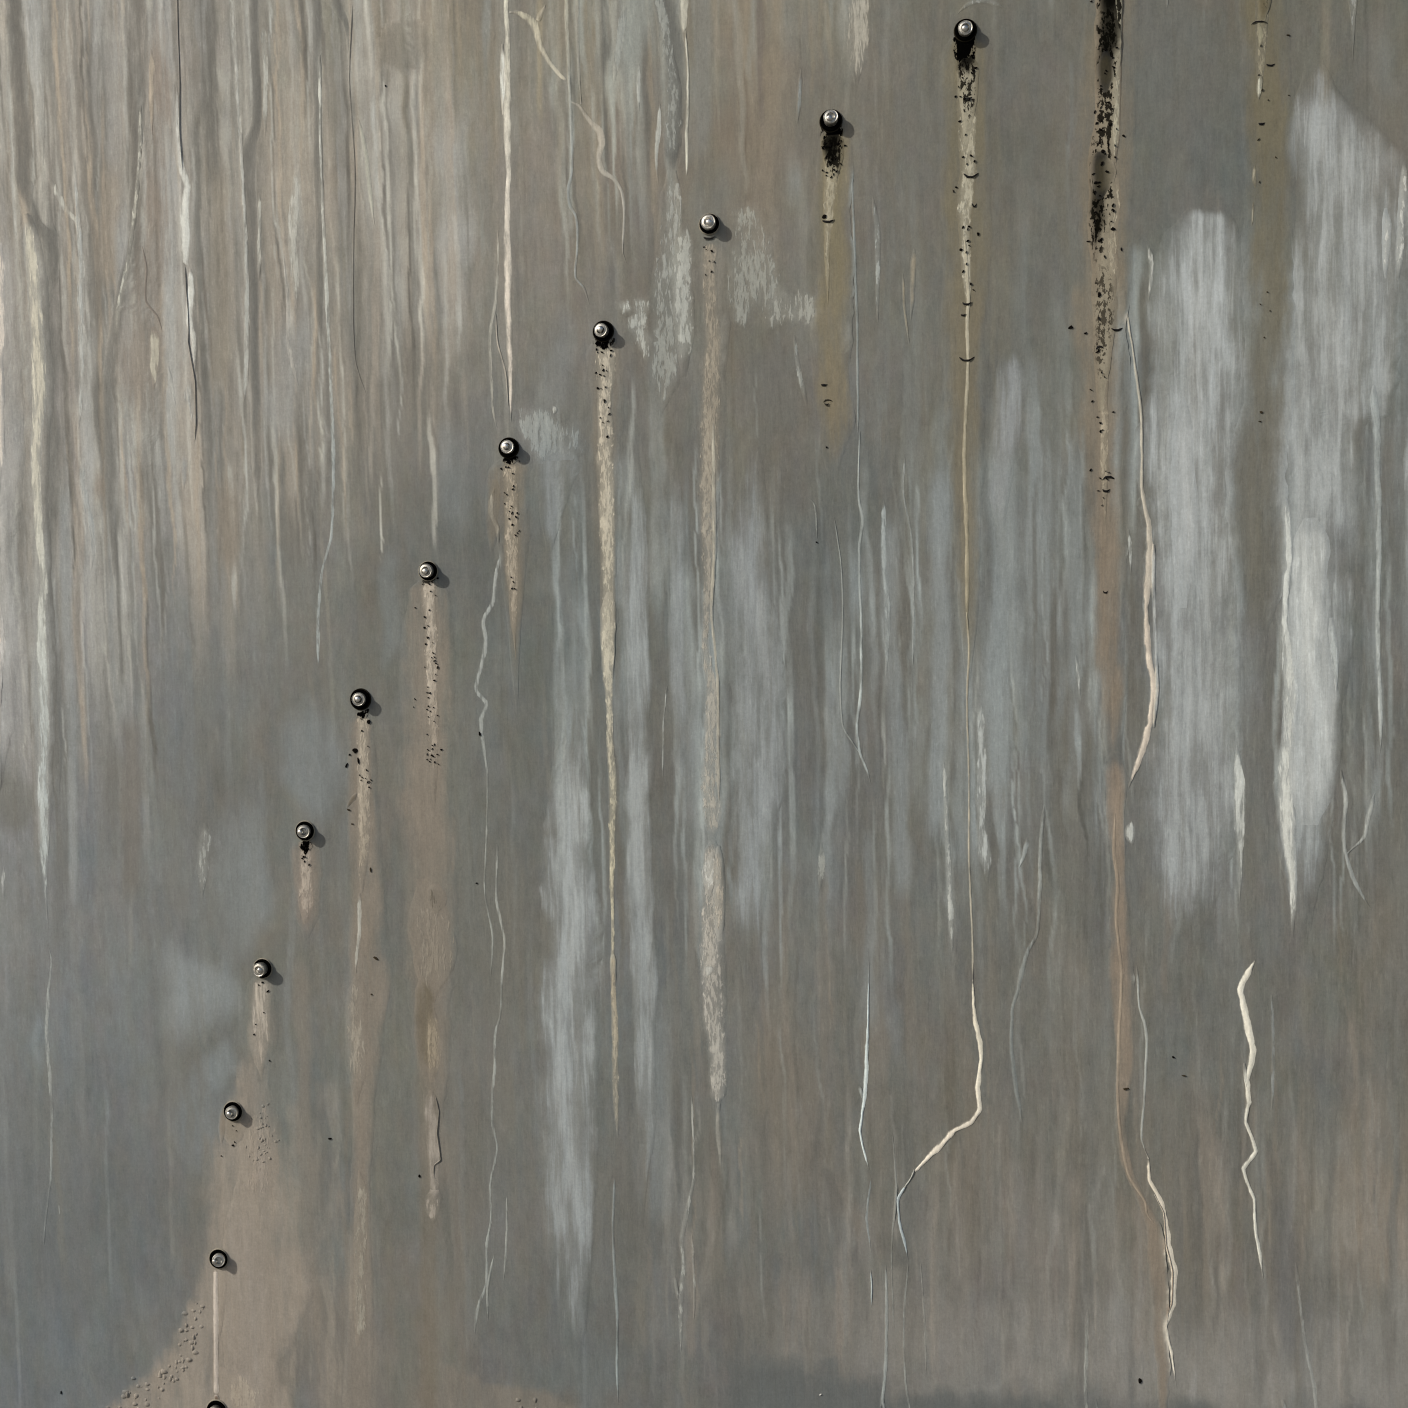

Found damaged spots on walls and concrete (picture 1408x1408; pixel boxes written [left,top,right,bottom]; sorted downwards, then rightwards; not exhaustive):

damp [433,236,787,1408]
corrosion [810,123,855,484]
damp [808,179,871,784]
damp [881,500,891,678]
damp [701,1133,1115,1408]
crack [858,965,983,1308]
corrosion [1067,0,1171,1408]
crack [1136,965,1179,1386]
damp [1125,206,1246,950]
crack [1237,959,1265,1284]
corrosion [1225,0,1297,697]
damp [1272,44,1408,950]